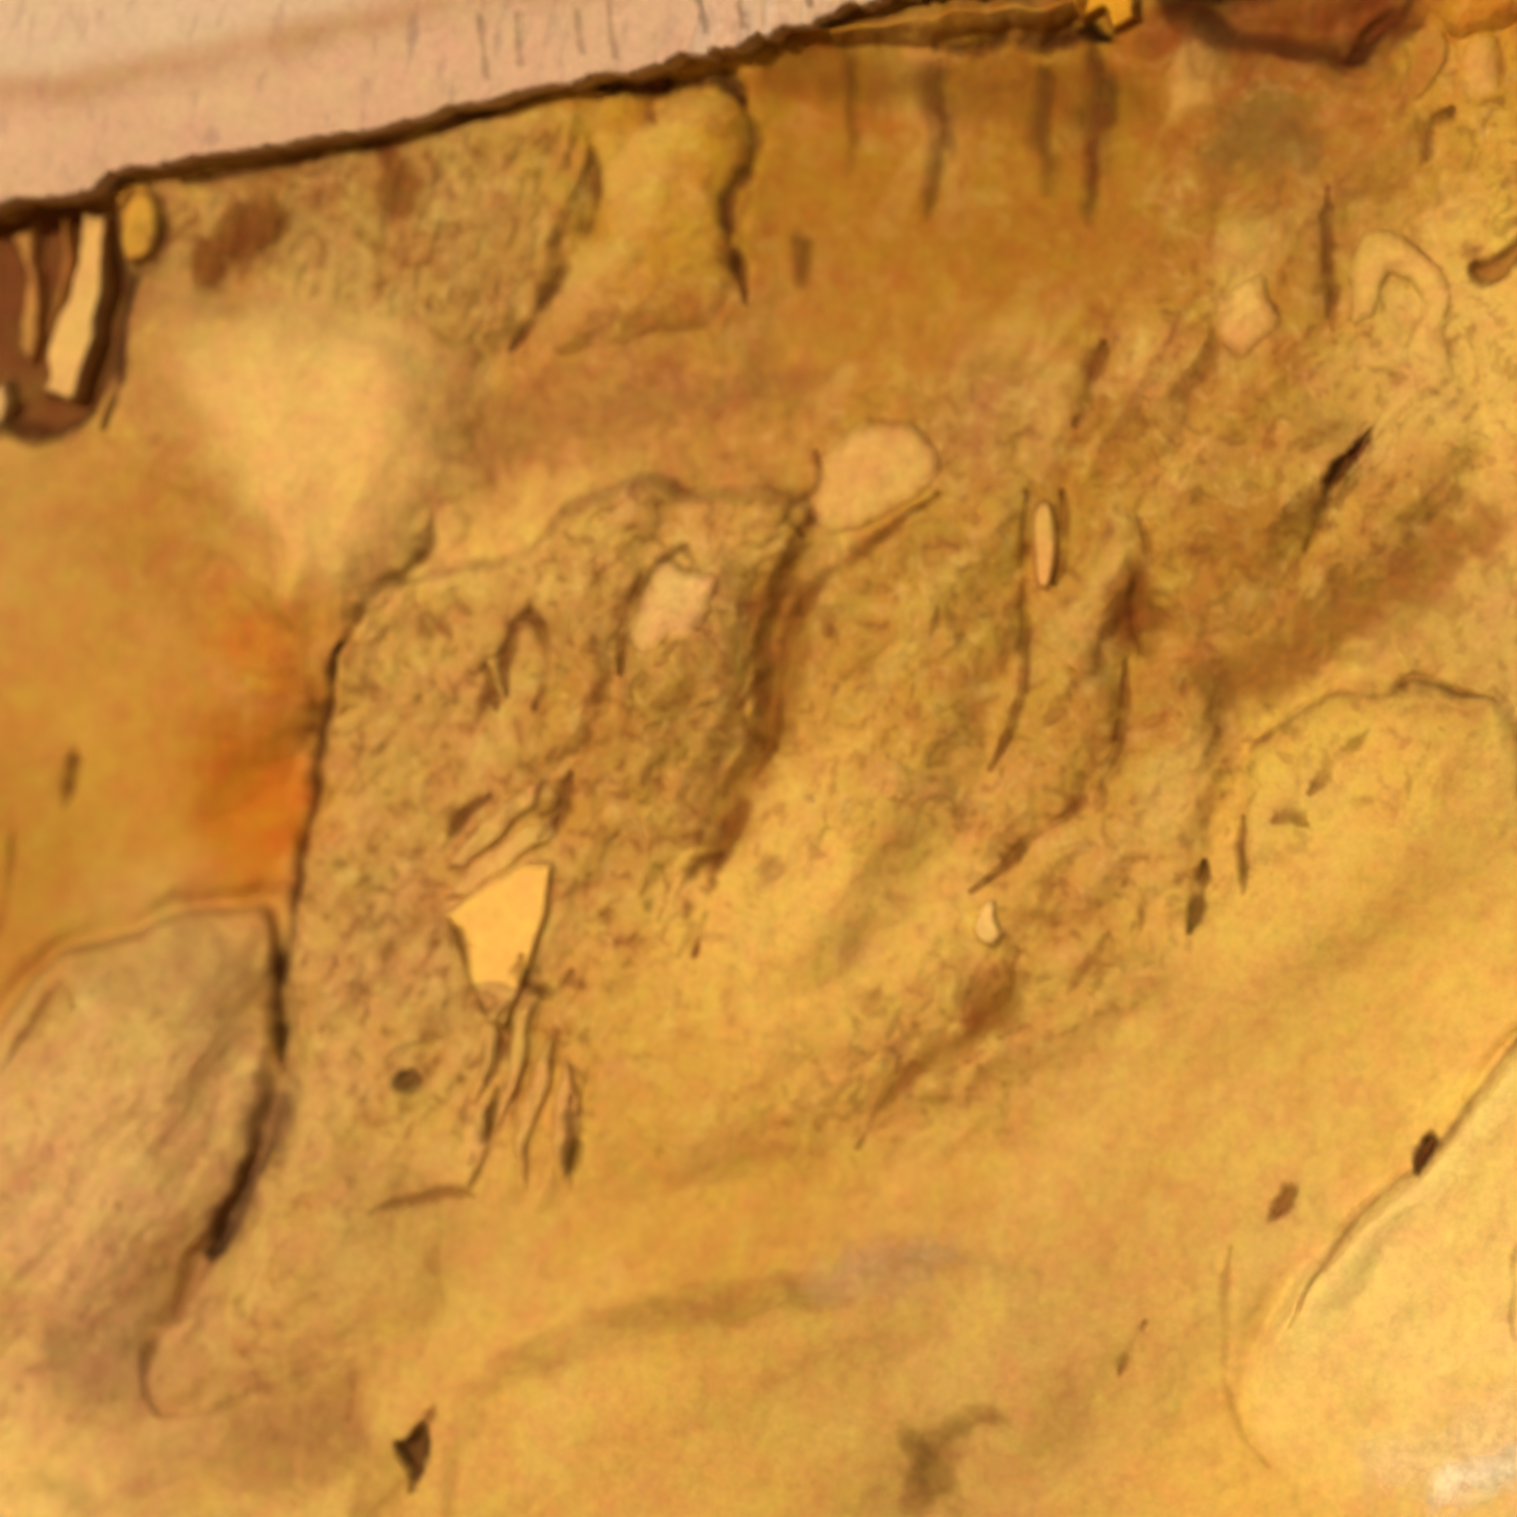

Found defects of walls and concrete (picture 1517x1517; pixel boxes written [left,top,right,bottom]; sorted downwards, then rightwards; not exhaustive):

damp [1081,46,1115,211]
crack [394,536,431,582]
crack [292,603,364,913]
spalling [0,355,816,1201]
crack [712,820,738,871]
crack [273,953,290,1059]